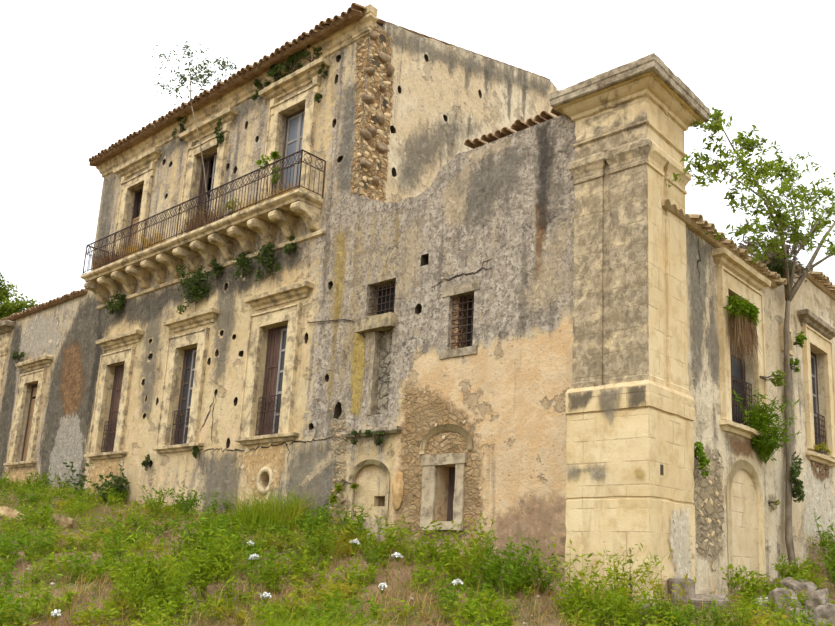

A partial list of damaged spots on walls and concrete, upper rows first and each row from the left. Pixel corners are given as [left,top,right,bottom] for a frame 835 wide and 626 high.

spalling [337,25,401,202]
leakage [399,119,476,189]
leakage [389,33,549,116]
leakage [536,123,549,228]
leakage [39,243,302,490]
crack [200,395,342,461]
spalling [396,381,489,546]
crack [431,258,493,288]
spalling [669,448,726,578]
leakage [686,232,719,386]